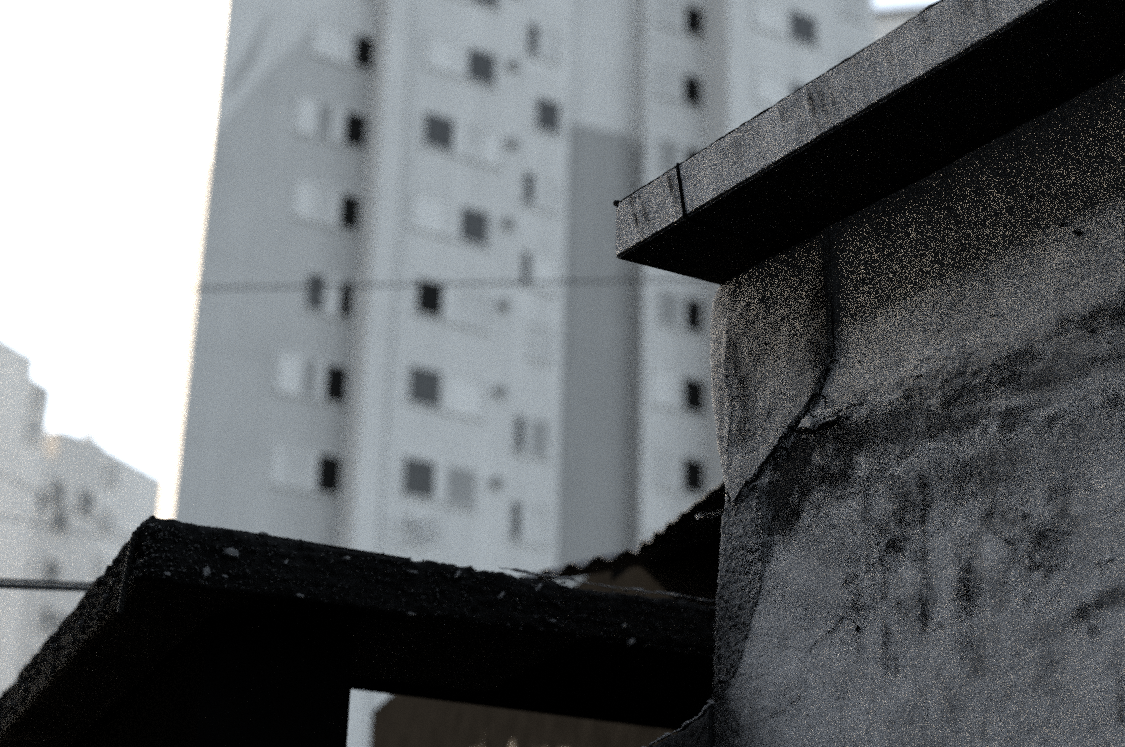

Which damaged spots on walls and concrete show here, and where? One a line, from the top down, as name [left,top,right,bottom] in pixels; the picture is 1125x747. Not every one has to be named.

crack [721,293,895,514]
water stain [810,277,830,397]
water stain [761,305,1125,618]
water stain [1074,587,1125,632]